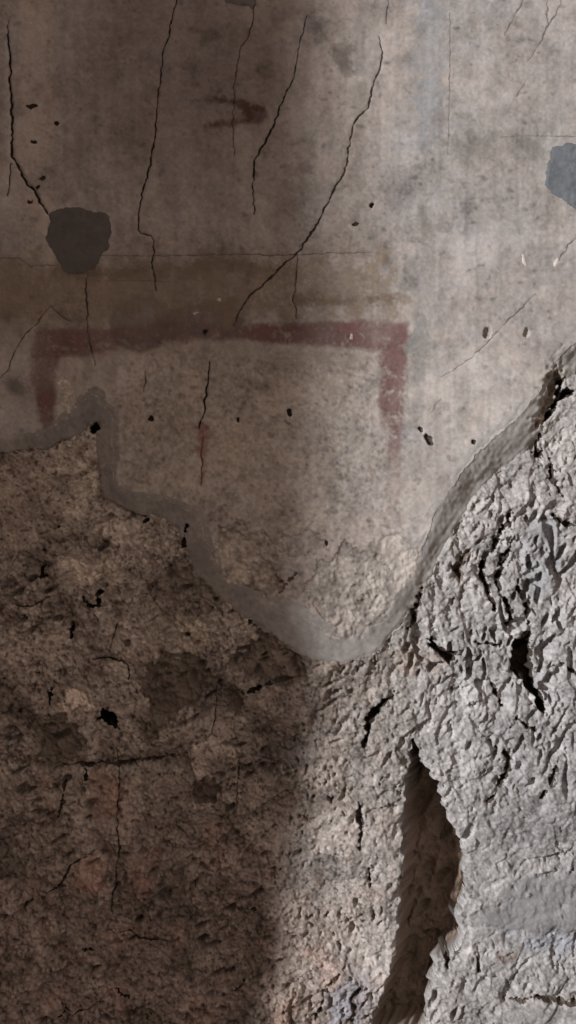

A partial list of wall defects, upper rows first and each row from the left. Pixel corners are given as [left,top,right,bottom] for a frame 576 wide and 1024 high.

crack [7,25,48,214]
crack [138,0,177,292]
crack [232,3,389,326]
crack [198,362,210,484]
spalling [282,528,422,639]
spalling [41,712,82,768]
spalling [138,650,207,741]
spalling [228,636,309,690]